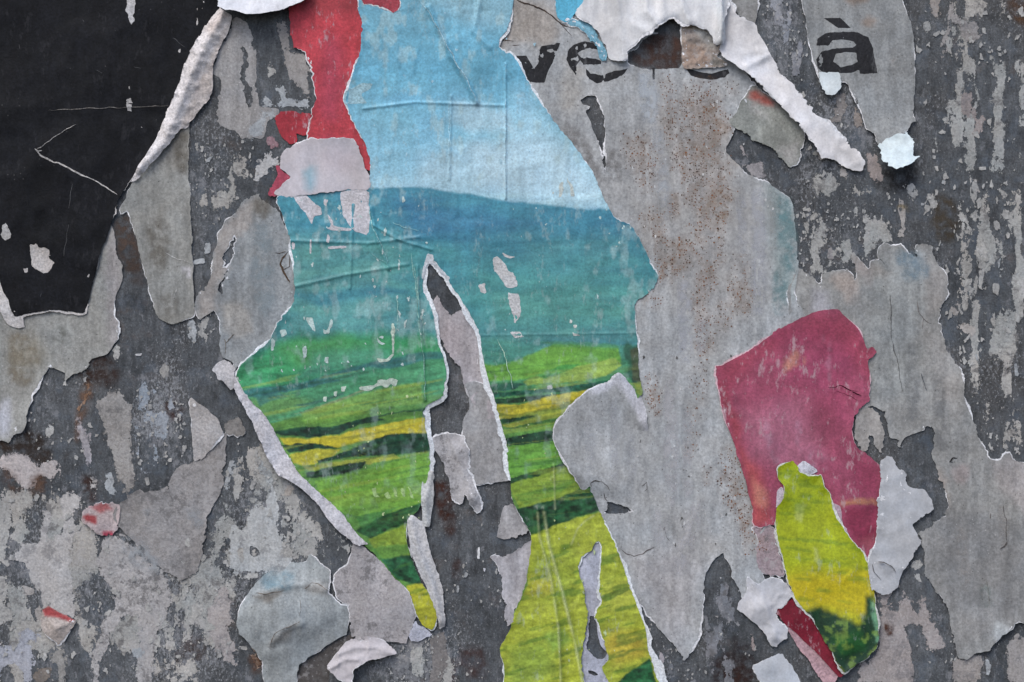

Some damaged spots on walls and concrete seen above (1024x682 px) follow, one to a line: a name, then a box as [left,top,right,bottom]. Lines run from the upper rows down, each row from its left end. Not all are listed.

peeling [362,0,401,13]
peeling [190,17,321,225]
peeling [1,223,11,240]
peeling [24,244,54,273]
peeling [294,189,387,249]
peeling [493,253,524,338]
corrosion [620,36,753,458]
peeling [796,0,1024,455]
peeling [0,364,352,682]
peeling [381,621,489,682]
peeling [858,585,991,682]
peeling [998,633,1024,682]